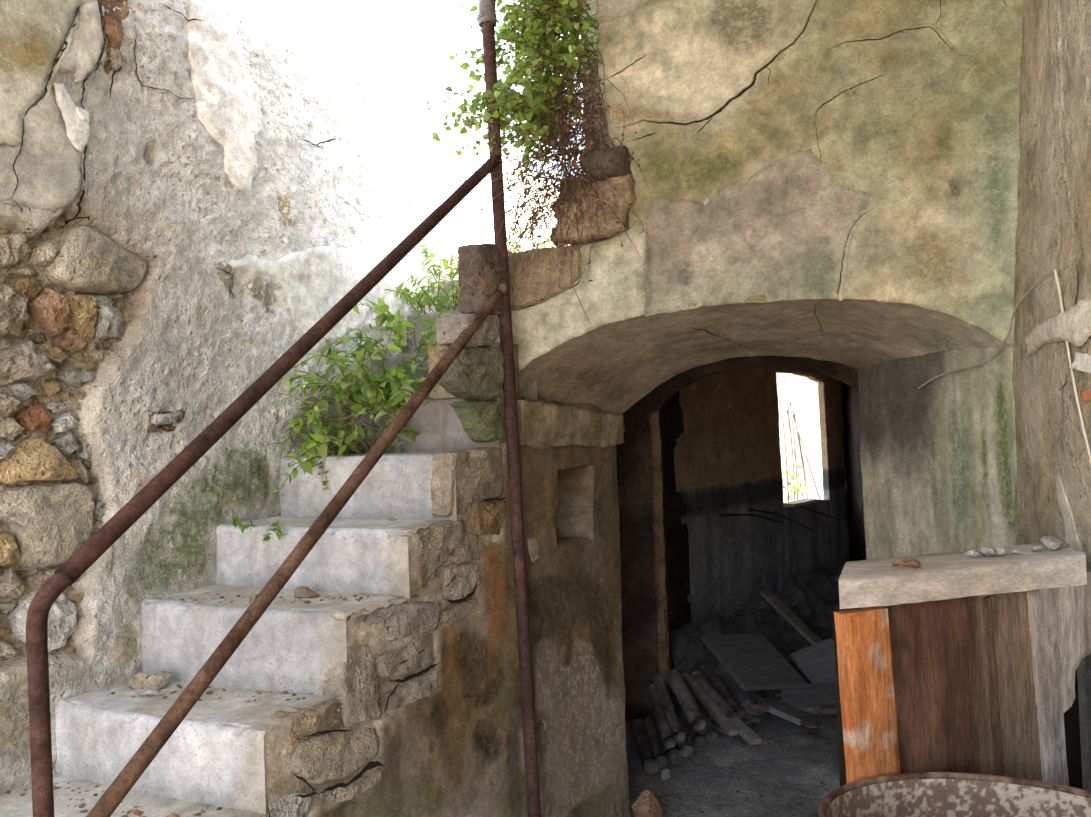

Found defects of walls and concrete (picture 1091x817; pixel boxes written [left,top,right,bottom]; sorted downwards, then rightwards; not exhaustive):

crack [1,0,199,234]
crack [605,52,646,79]
crack [615,0,818,141]
crack [811,72,885,162]
crack [827,0,962,54]
flaking render [643,148,871,317]
crack [814,206,879,333]
spalling [0,216,148,661]